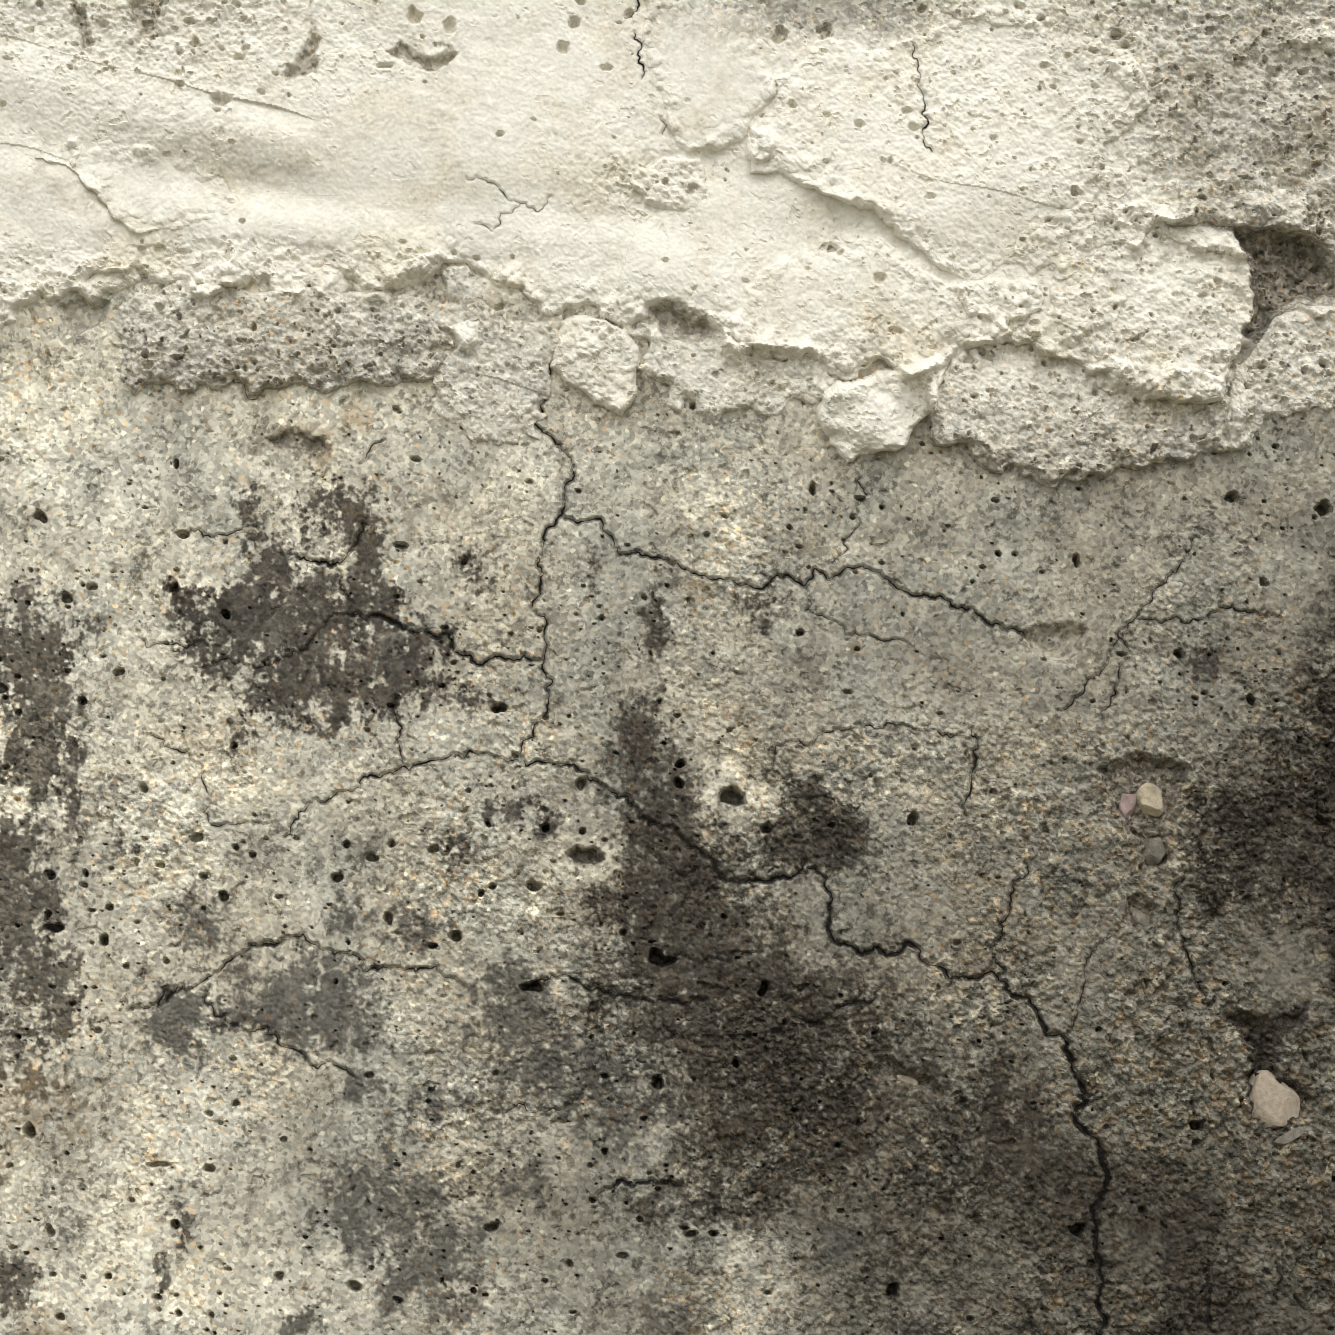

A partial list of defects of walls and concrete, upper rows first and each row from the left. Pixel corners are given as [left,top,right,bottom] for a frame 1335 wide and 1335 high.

peeling [0,309,16,332]
peeling [35,0,1335,489]
leakage [162,474,500,758]
leakage [637,566,671,663]
leakage [736,584,793,635]
crack [1058,537,1281,718]
crack [127,366,1118,1333]
leakage [136,686,1271,1335]
crack [1173,870,1206,1003]
leakage [1186,574,1335,993]
leakage [0,1255,43,1318]
crack [1204,1270,1216,1333]